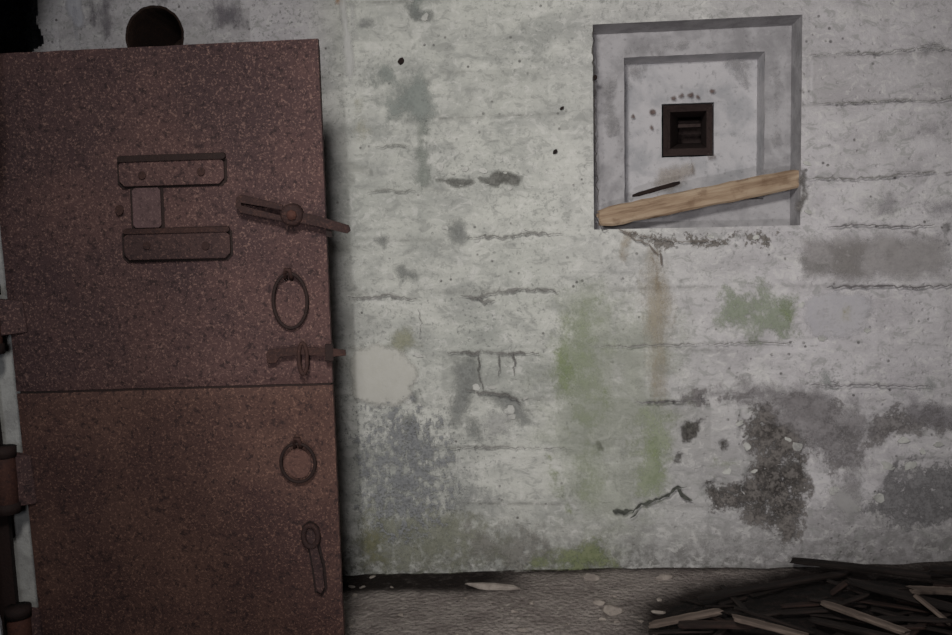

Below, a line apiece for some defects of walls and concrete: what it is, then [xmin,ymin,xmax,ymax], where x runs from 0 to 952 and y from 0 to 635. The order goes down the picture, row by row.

spalling [436,162,520,190]
spalling [796,161,812,214]
spalling [441,223,481,244]
spalling [627,230,780,252]
crack [447,350,539,404]
damp [733,373,877,498]
crack [613,486,693,518]